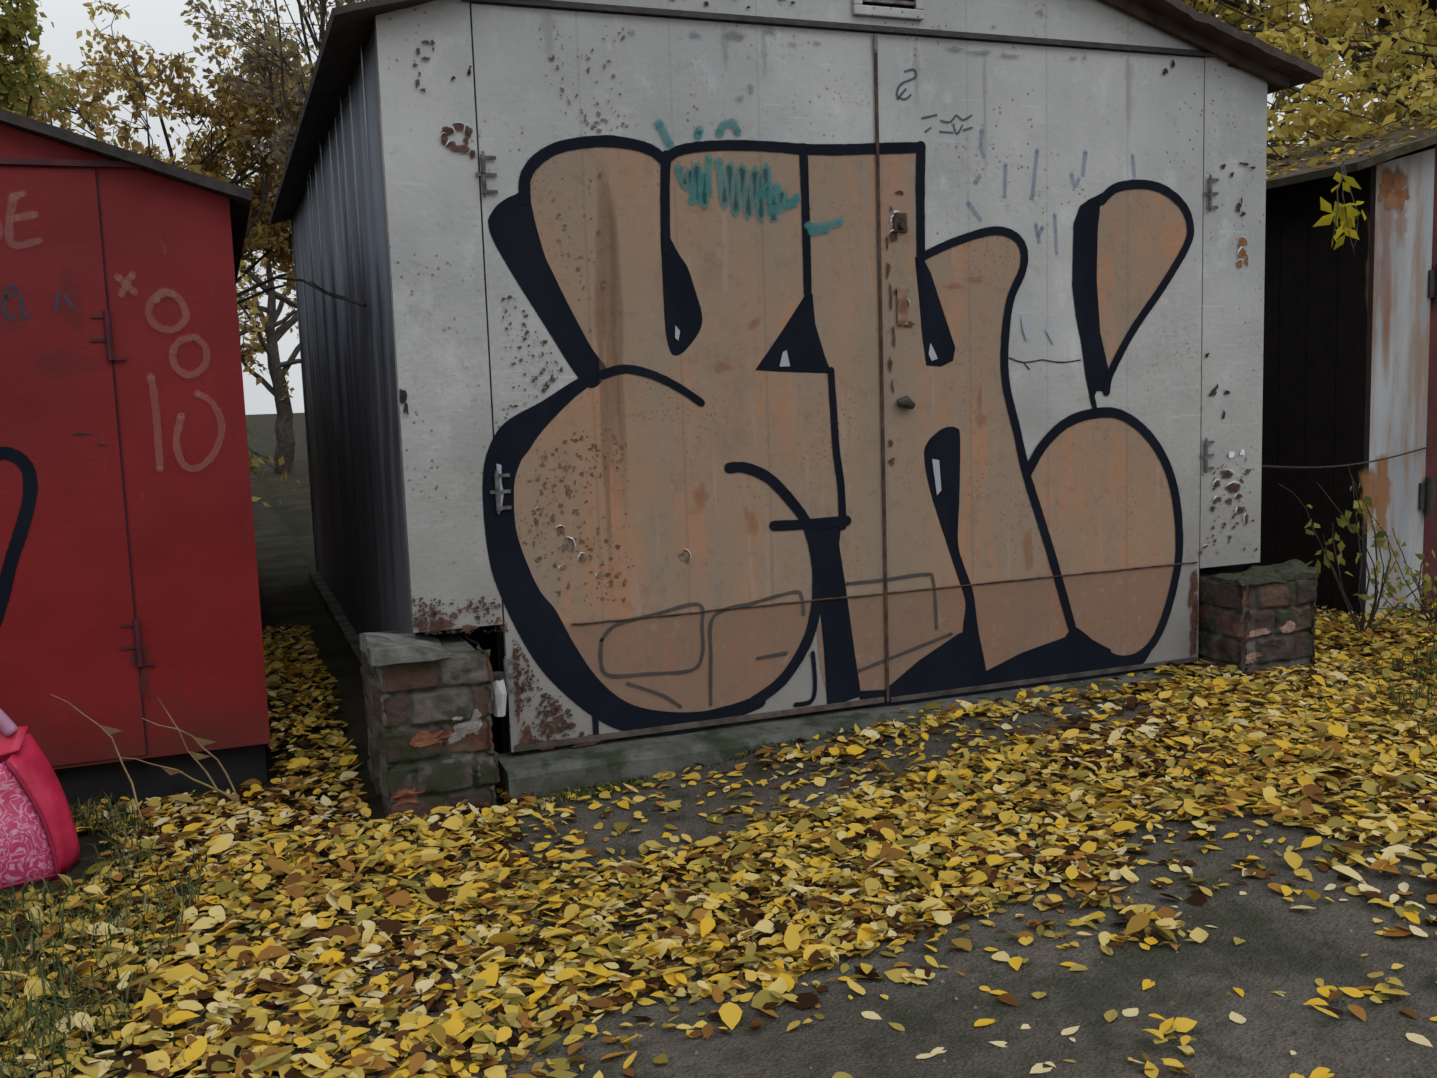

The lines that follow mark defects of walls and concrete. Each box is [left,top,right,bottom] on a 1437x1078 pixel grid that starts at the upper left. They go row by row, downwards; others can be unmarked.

corrosion [1378,168,1409,210]
corrosion [501,295,563,410]
corrosion [1207,458,1258,554]
corrosion [412,596,601,753]